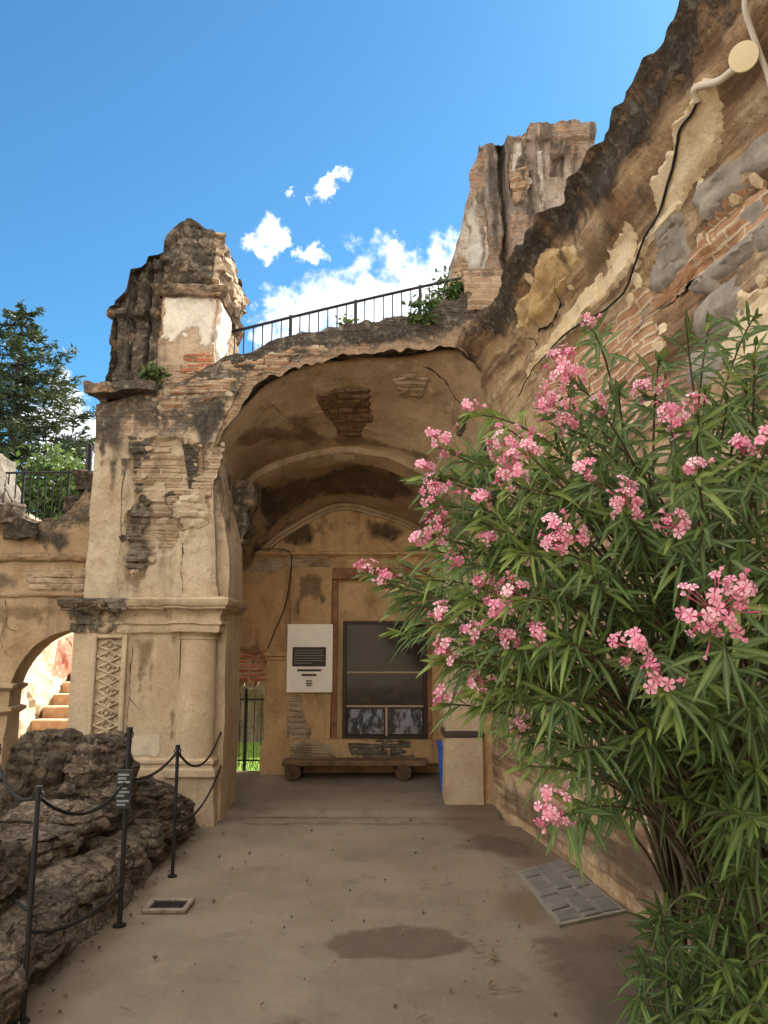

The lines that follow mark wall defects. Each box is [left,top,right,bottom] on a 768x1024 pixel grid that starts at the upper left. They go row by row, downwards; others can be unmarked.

flaking render [508,153,533,205]
flaking render [446,238,474,301]
flaking render [515,78,768,465]
crack [523,283,562,364]
flaking render [119,295,332,576]
flaking render [312,385,373,437]
crack [423,366,478,427]
water stain [371,524,401,540]
flaking render [26,563,86,593]